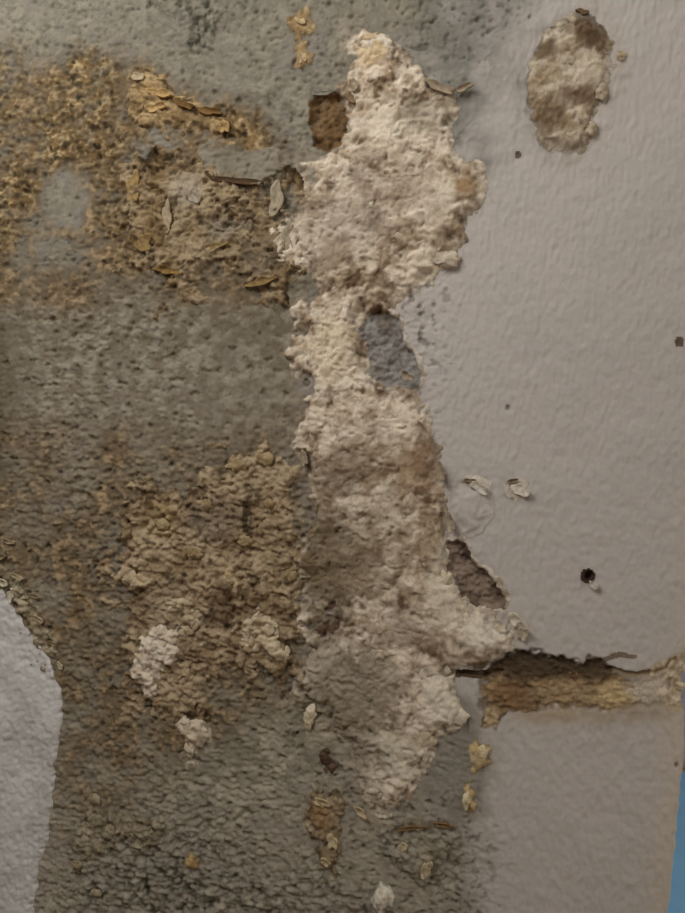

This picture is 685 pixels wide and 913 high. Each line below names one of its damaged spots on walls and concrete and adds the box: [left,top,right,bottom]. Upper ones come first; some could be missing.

peeling [285,5,316,69]
spalling [307,90,356,153]
peeling [112,65,305,321]
spalling [355,308,426,391]
leakage [0,0,520,913]
peeling [460,475,492,495]
peeling [503,477,531,500]
spalling [91,435,343,725]
spalling [444,535,685,729]
spalling [319,747,339,774]
peeling [304,787,367,882]
peeling [376,739,492,887]